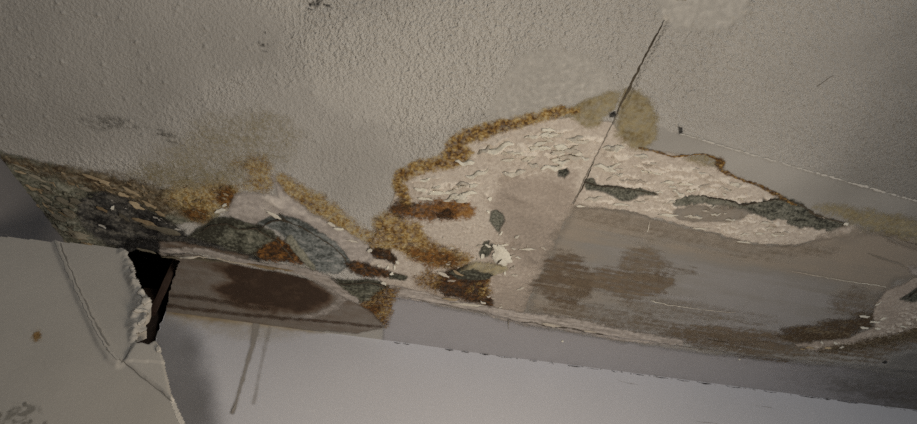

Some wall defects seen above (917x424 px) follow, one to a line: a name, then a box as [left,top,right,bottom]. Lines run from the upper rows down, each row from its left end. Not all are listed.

crack [571,21,664,206]
peeling [0,151,116,248]
crack [106,343,172,401]
leakage [1,89,797,424]
peeling [127,116,865,332]
leakage [527,205,917,362]
peeling [795,277,917,351]